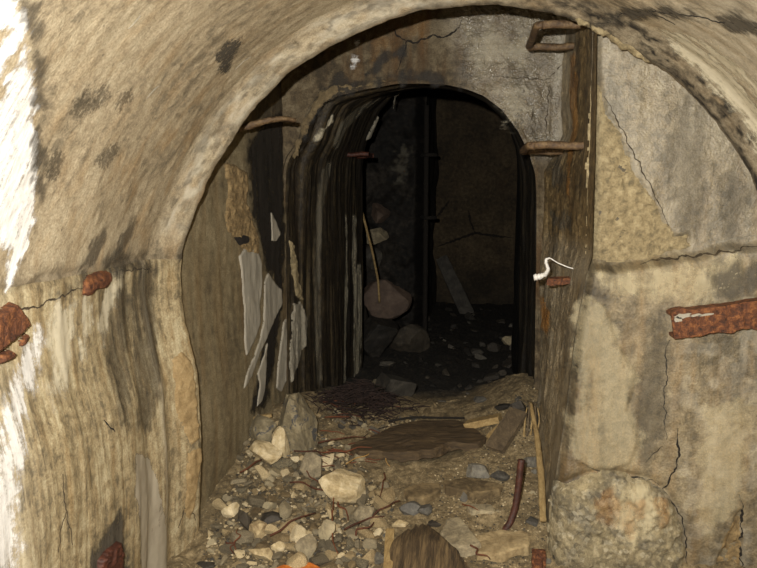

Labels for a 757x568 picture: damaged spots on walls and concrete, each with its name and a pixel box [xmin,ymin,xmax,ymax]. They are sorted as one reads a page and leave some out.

damp [215,37,243,74]
crack [393,20,462,73]
crack [604,97,669,226]
spalling [585,75,691,262]
crack [20,288,83,310]
peeling [224,162,308,406]
crack [642,235,757,264]
crack [631,340,687,563]